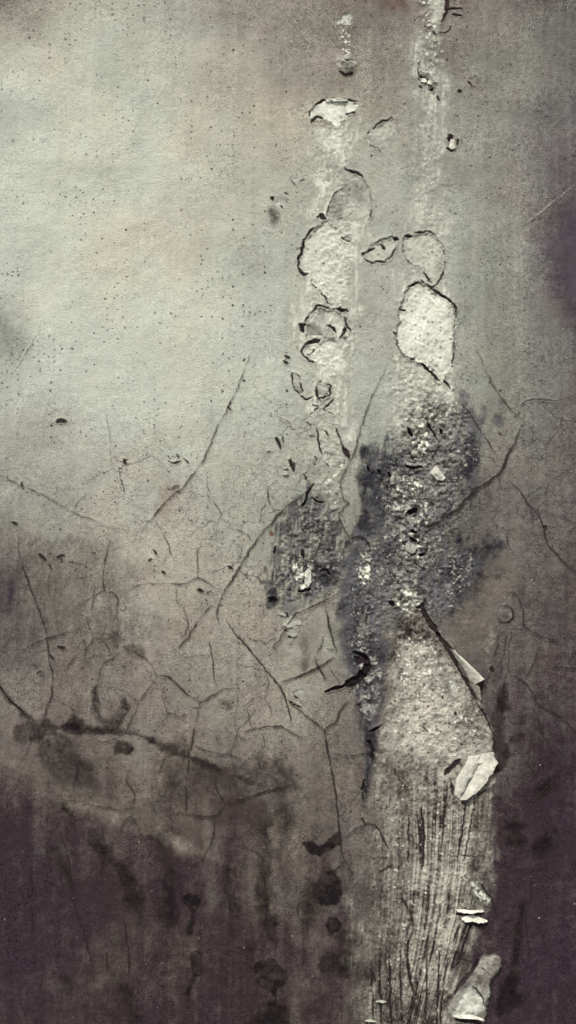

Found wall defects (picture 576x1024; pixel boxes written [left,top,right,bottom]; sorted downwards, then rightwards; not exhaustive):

peeling [308,98,358,126]
crack [155,358,249,555]
crack [316,377,382,549]
crack [429,379,576,573]
leakage [0,686,295,938]
crack [17,490,393,873]
leakage [251,958,288,1024]
leakage [302,832,342,856]
leakage [304,870,363,978]
peeling [269,169,502,1024]
leakage [493,686,524,771]
leakage [497,903,525,1014]